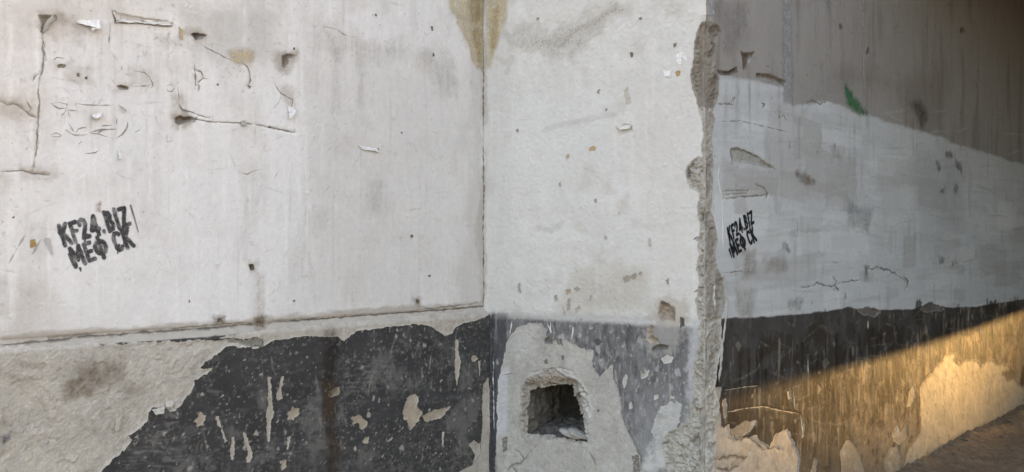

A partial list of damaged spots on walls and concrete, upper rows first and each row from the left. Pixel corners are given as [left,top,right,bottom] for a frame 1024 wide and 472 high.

peeling [112,10,207,40]
leakage [450,0,505,67]
crack [3,0,485,345]
spalling [646,20,818,472]
crack [803,267,909,290]
peeling [0,309,489,472]
peeling [459,323,642,472]
peeling [840,440,864,472]
peeling [884,352,1024,472]